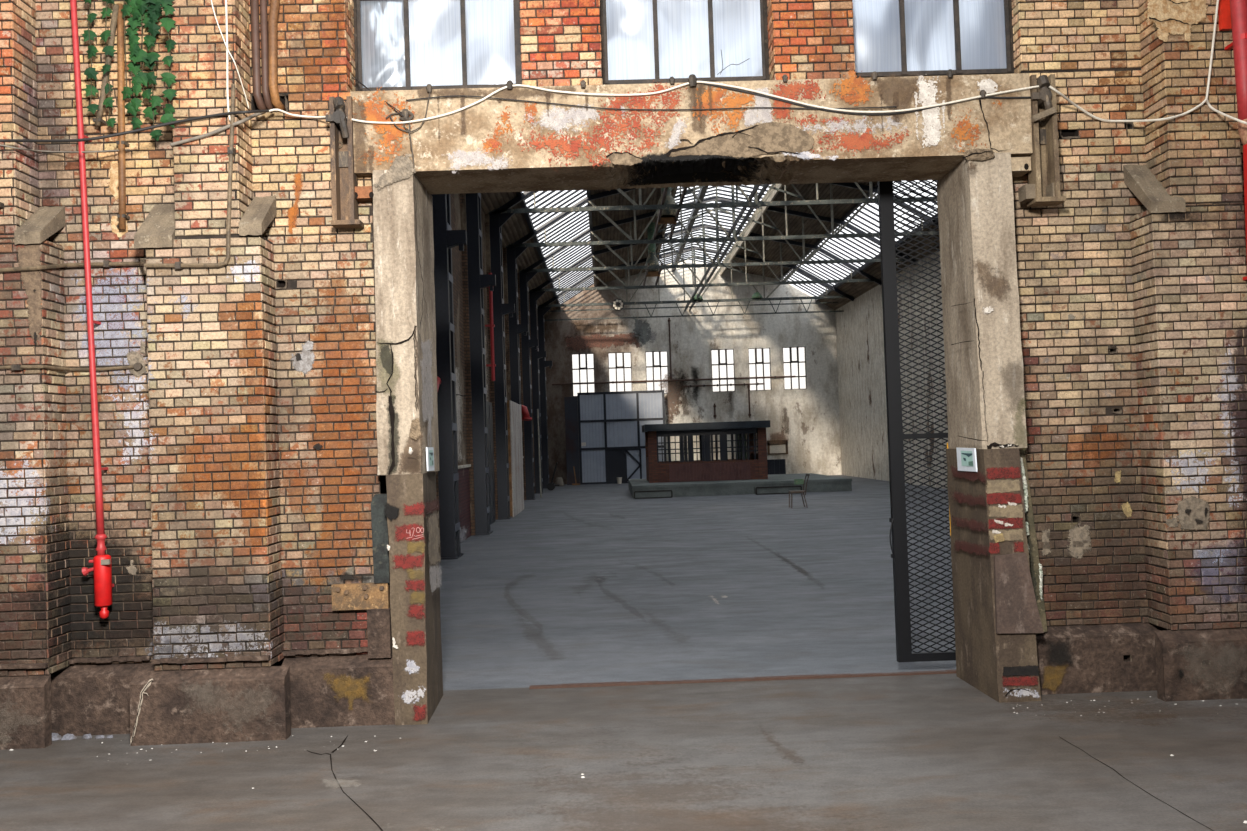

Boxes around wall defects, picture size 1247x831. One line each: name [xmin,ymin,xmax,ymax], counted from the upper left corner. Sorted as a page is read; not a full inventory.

flaking render [1147,0,1208,42]
spalling [482,70,912,186]
peeling [948,106,995,161]
spalling [408,327,421,459]
leakage [0,456,278,659]
crack [307,736,383,831]
crack [1060,737,1212,830]